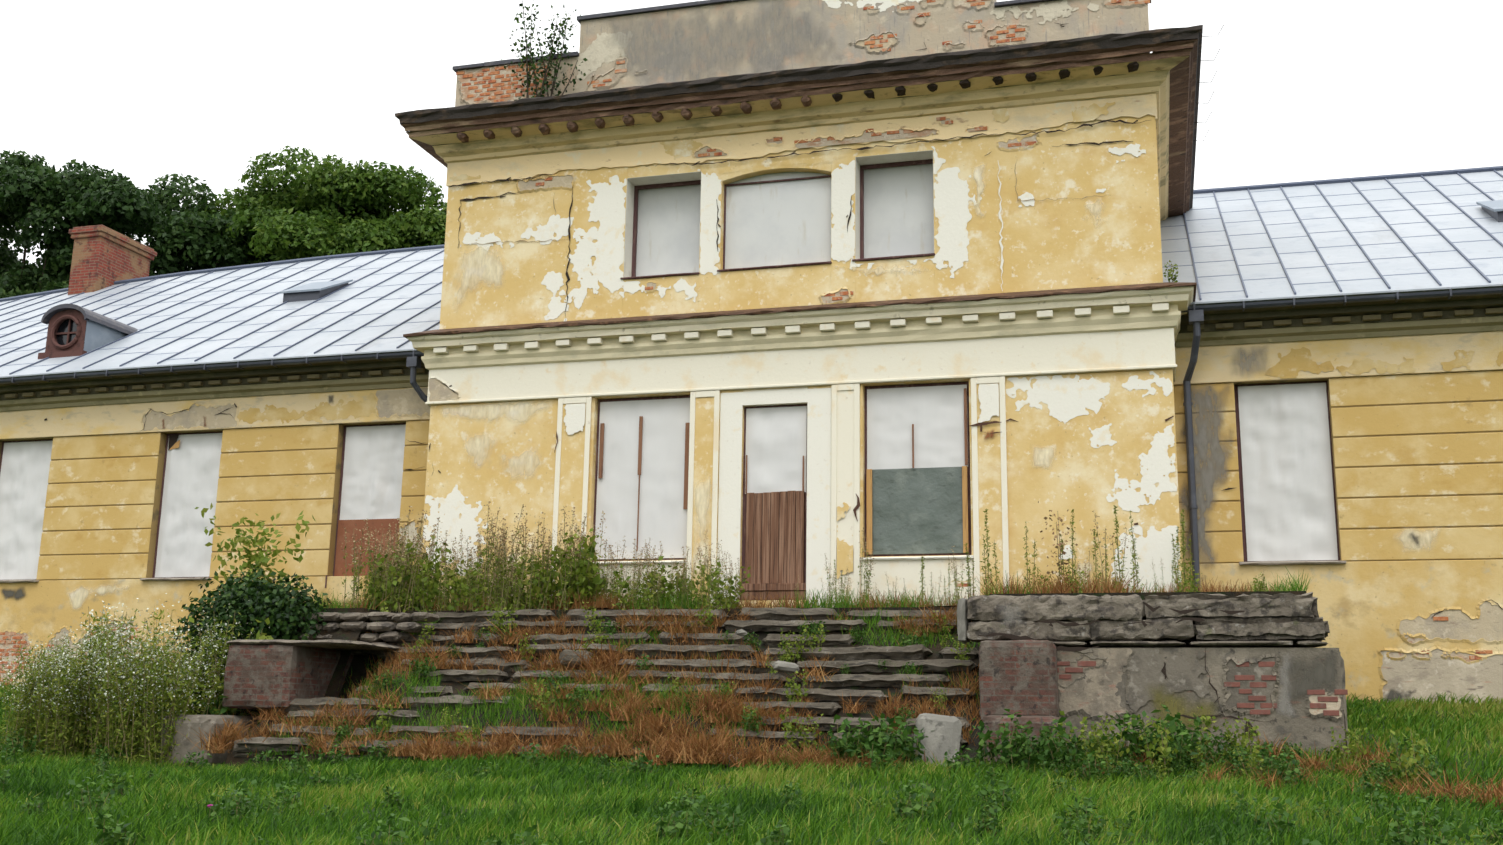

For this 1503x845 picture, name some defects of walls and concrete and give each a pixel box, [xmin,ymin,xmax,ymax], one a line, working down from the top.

peeling [822,0,1150,55]
peeling [1108,143,1146,163]
crack [450,174,573,316]
peeling [458,108,1042,321]
peeling [1265,347,1416,379]
peeling [978,371,1172,448]
peeling [399,484,490,576]
peeling [1106,424,1181,592]
spalling [0,618,138,686]
crack [1180,648,1277,722]
spalling [1305,686,1348,722]
spalling [1377,598,1503,704]